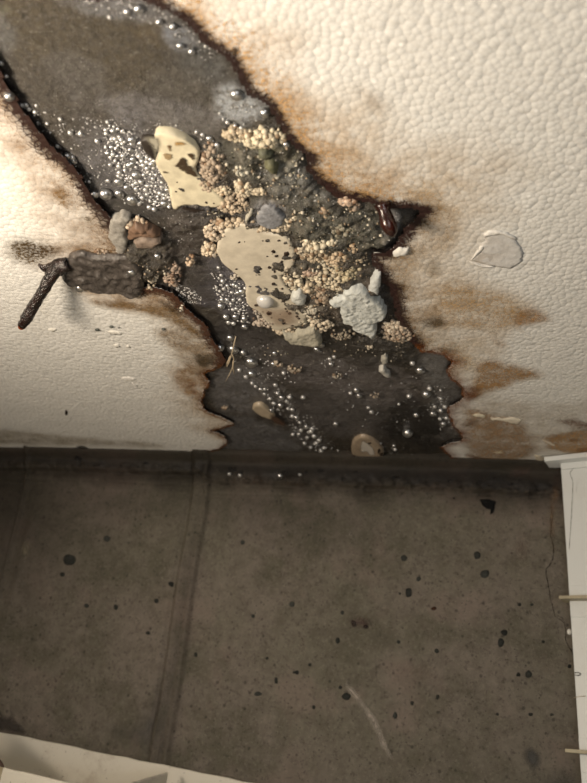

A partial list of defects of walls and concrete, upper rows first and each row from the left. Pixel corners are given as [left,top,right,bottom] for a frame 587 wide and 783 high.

damp [10,240,62,265]
damp [0,71,115,251]
damp [143,0,473,373]
spalling [469,230,524,268]
damp [96,288,226,418]